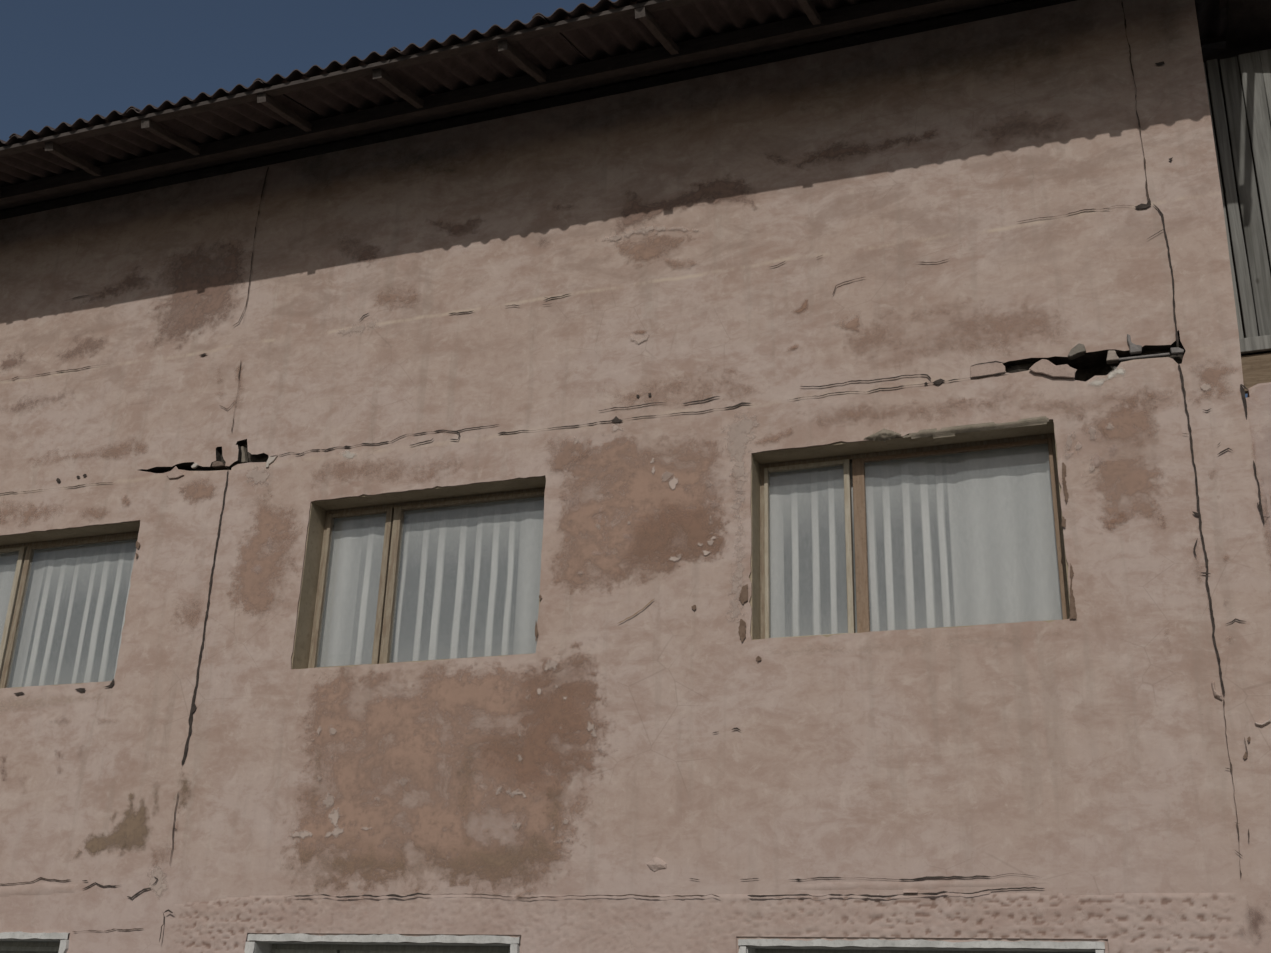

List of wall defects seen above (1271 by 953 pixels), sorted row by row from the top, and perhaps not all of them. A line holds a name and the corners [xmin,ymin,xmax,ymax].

crack [233,167,269,326]
spalling [139,439,277,500]
crack [270,396,751,457]
crack [789,361,1008,400]
spalling [1061,434,1081,528]
spalling [970,330,1186,382]
peeling [1090,396,1160,528]
crack [1018,2,1266,876]
peeling [227,506,295,613]
crack [289,873,1044,899]